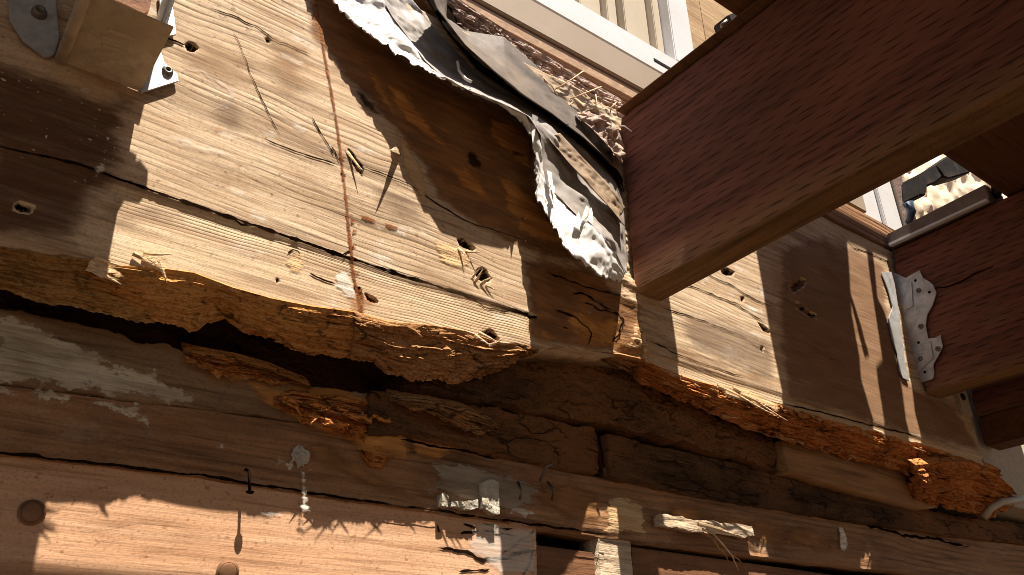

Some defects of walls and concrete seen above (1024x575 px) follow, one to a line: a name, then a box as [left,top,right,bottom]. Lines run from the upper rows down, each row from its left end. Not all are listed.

corrosion [315,0,372,312]
damp [0,316,193,425]
crack [0,146,537,319]
peeling [282,394,391,428]
peeling [336,272,355,298]
damp [252,383,452,494]
peeling [349,315,393,329]
peeling [439,332,489,343]
crack [0,452,607,575]